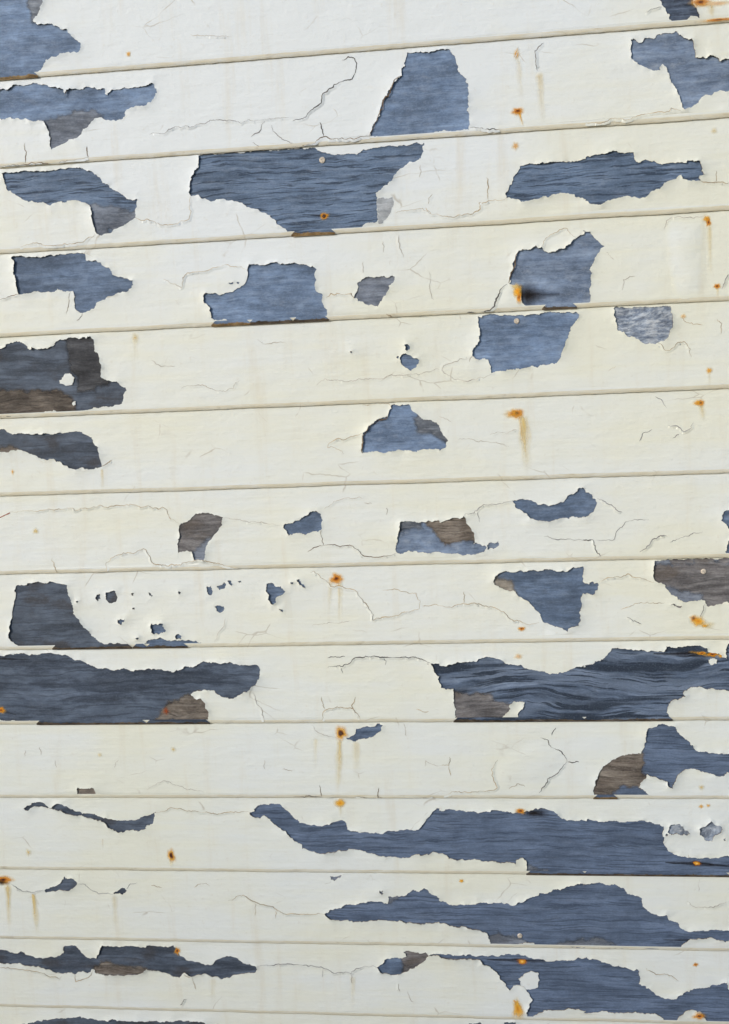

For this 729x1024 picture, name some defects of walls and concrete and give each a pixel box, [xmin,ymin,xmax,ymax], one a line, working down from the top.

peeling [2,168,137,236]
crack [150,56,370,147]
peeling [189,49,470,237]
peeling [505,151,703,205]
peeling [472,231,604,373]
peeling [0,337,126,469]
corrosion [511,410,526,444]
peeling [0,580,260,725]
crack [425,728,578,798]
peeling [431,644,729,799]
peeling [0,945,257,979]
peeling [250,804,729,1022]